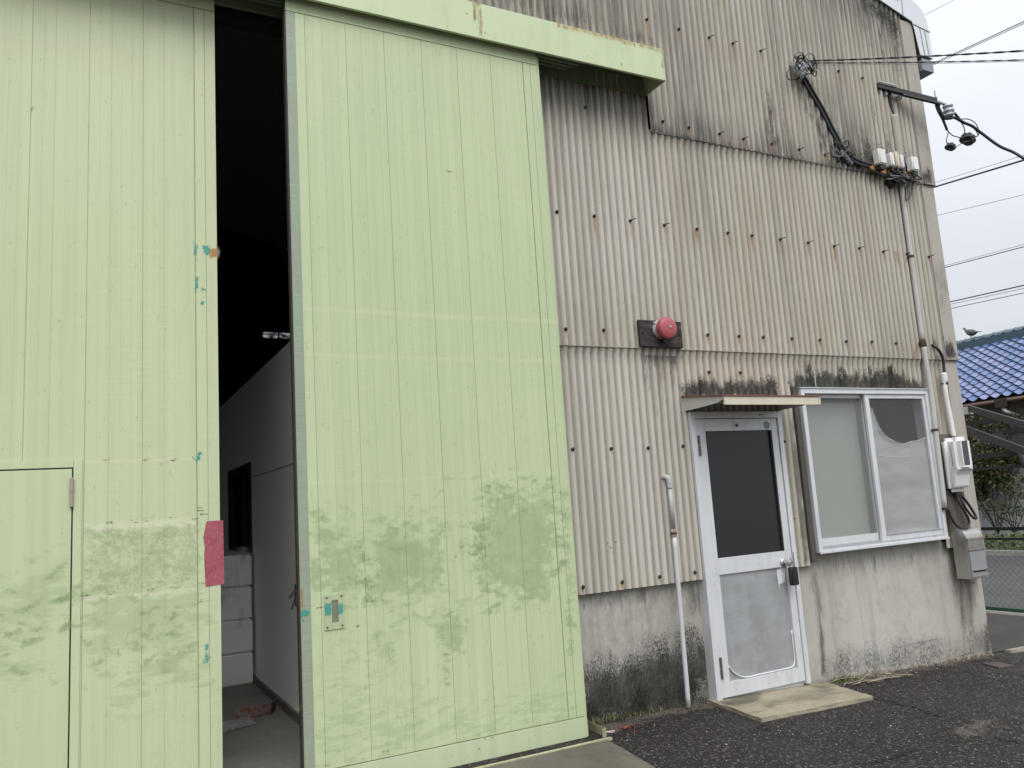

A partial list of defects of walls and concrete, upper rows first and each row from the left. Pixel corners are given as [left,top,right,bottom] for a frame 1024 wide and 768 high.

damp [682,364,923,396]
damp [584,627,709,722]